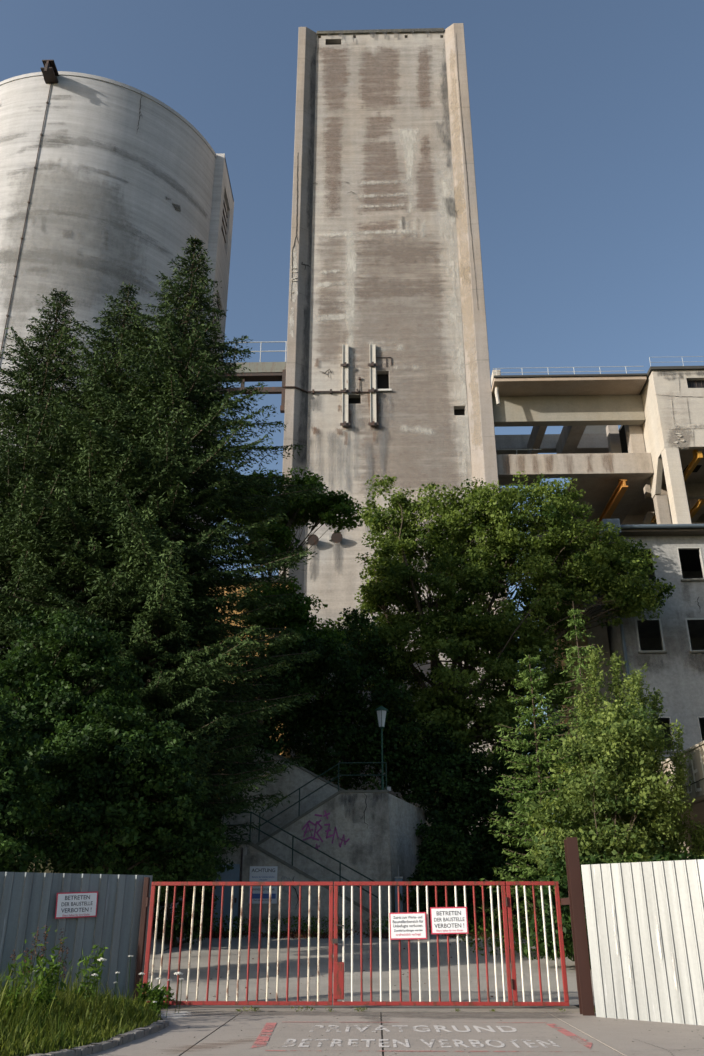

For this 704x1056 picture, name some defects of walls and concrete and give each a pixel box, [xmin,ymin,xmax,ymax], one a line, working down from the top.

leakage [299,28,471,507]